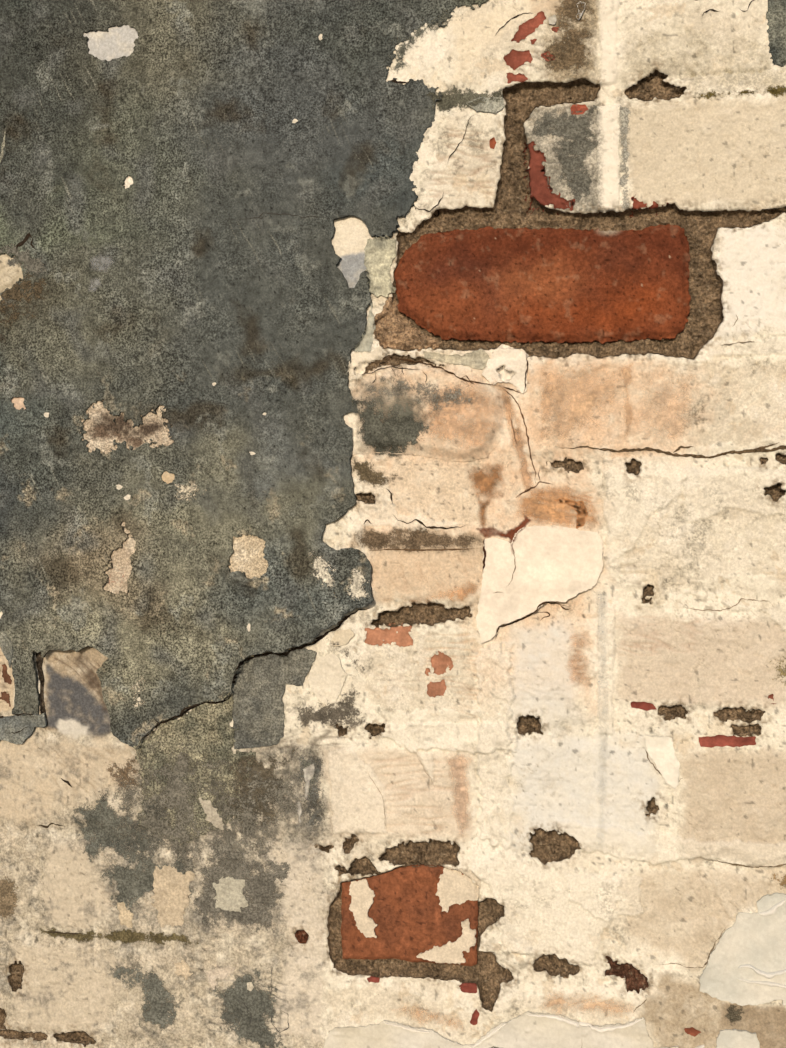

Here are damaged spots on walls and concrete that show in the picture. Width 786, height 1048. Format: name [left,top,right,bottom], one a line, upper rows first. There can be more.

flaking render [348,70,786,394]
peeling [0,0,489,845]
crack [366,356,550,498]
crack [570,442,786,458]
peeling [364,497,603,647]
crack [139,607,372,744]
spalling [517,715,543,735]
spalling [631,701,688,721]
spalling [699,694,775,748]
spalling [529,828,581,865]
flaking render [314,834,679,1048]
spalling [0,1008,96,1047]